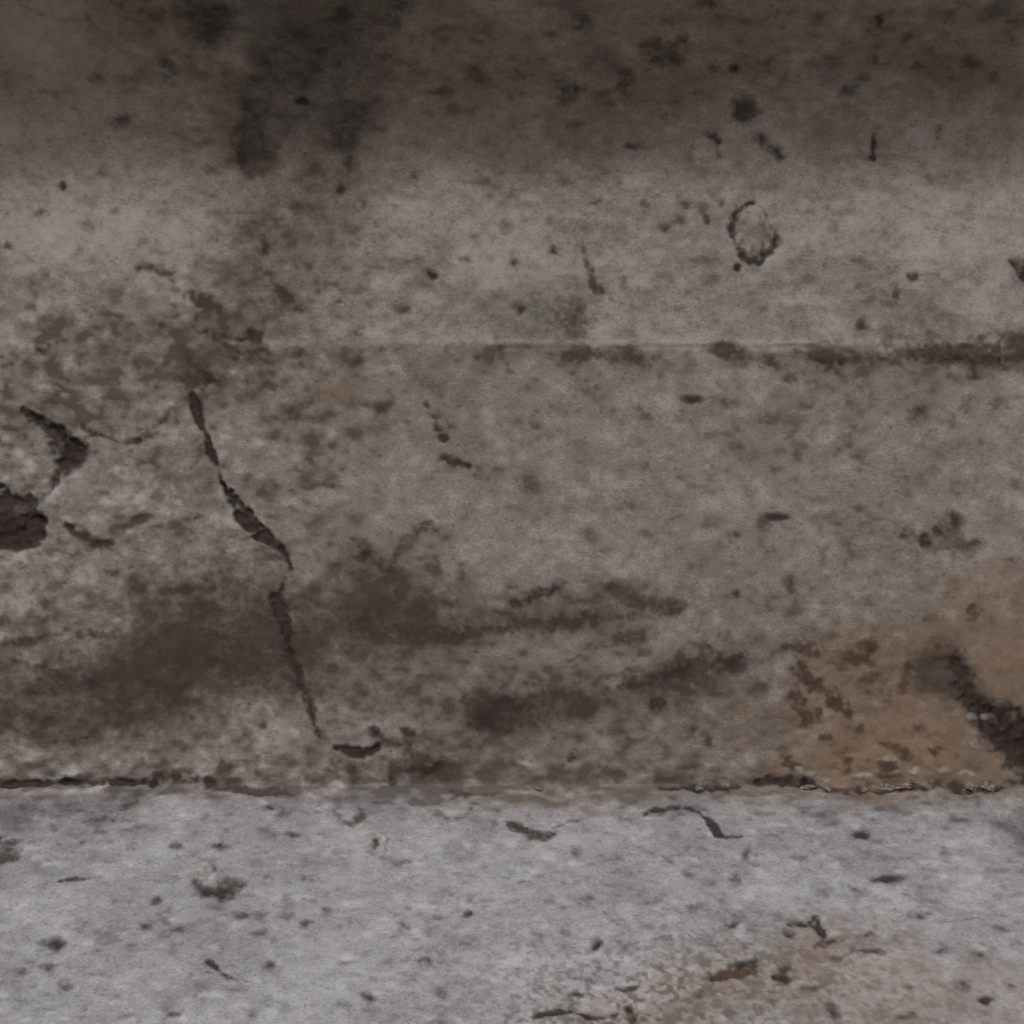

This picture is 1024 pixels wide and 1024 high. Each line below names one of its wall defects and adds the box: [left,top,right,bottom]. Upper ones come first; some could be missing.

spalling [728,202,778,271]
spalling [0,485,47,550]
crack [81,393,320,737]
damp [510,586,557,607]
damp [620,644,740,710]
rust [763,634,1003,796]
spalling [908,646,1024,769]
crack [644,776,1024,838]